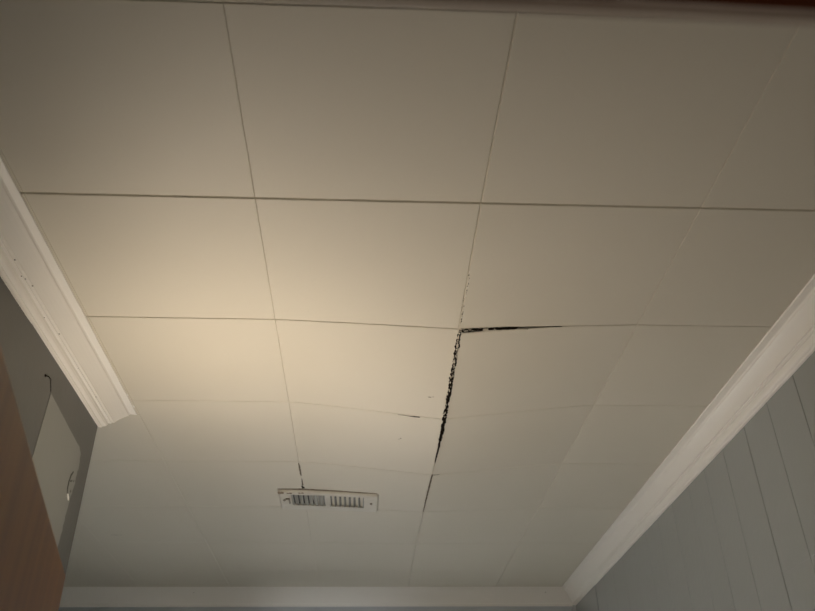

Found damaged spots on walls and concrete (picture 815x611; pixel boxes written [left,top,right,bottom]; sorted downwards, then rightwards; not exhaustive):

crack [423,326,562,511]